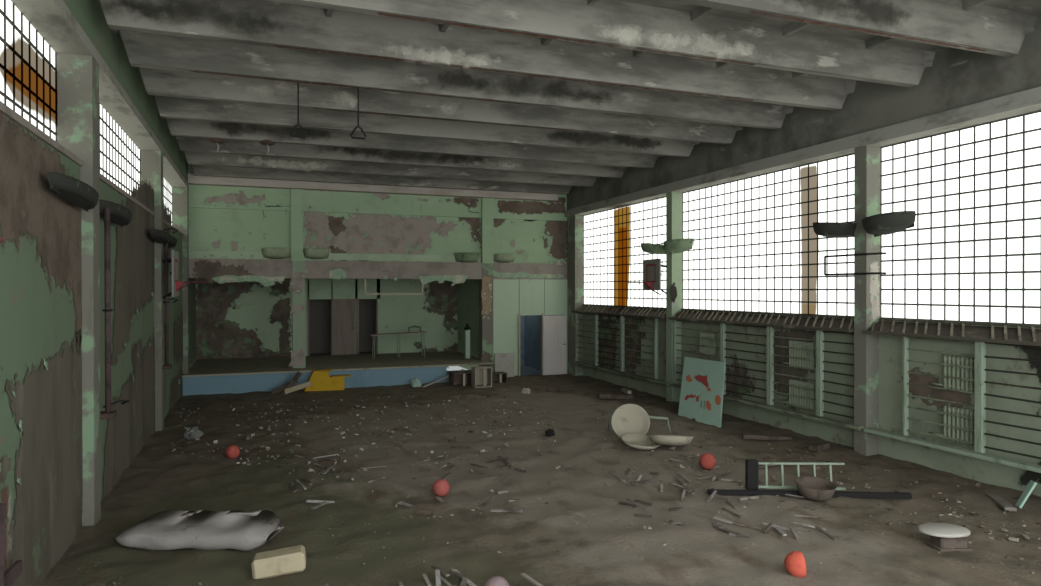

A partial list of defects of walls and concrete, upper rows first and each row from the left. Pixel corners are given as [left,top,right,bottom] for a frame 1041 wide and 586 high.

water stain [403,47,600,98]
water stain [550,132,660,148]
peeling [417,197,479,209]
peeling [303,212,458,280]
peeling [494,219,568,261]
peeling [419,275,468,286]
peeling [481,276,492,319]
peeling [101,179,183,503]
peeling [0,334,83,586]